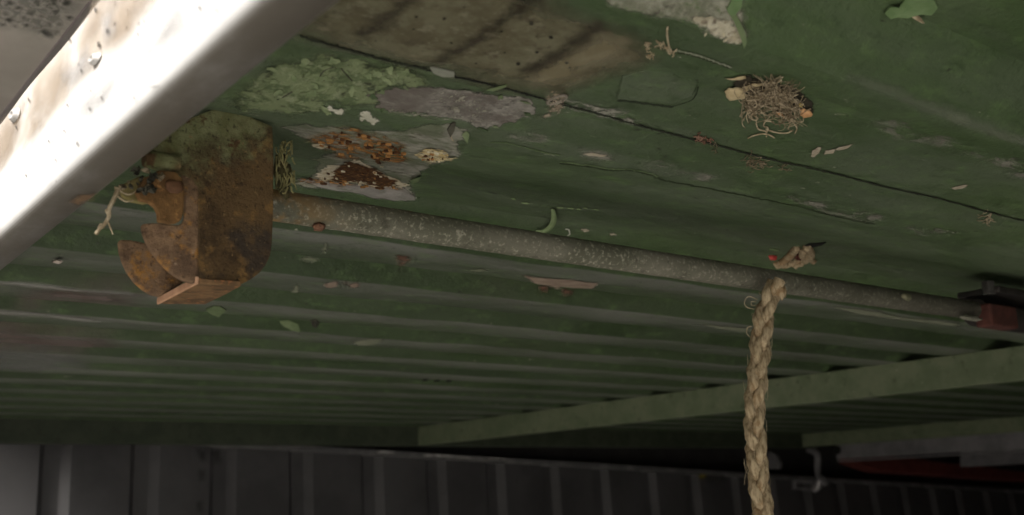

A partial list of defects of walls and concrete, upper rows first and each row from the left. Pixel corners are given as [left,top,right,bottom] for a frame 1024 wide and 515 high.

water stain [306,0,646,92]
peeling [607,0,747,49]
rust [281,123,469,201]
peeling [230,53,536,142]
crack [299,35,1024,225]